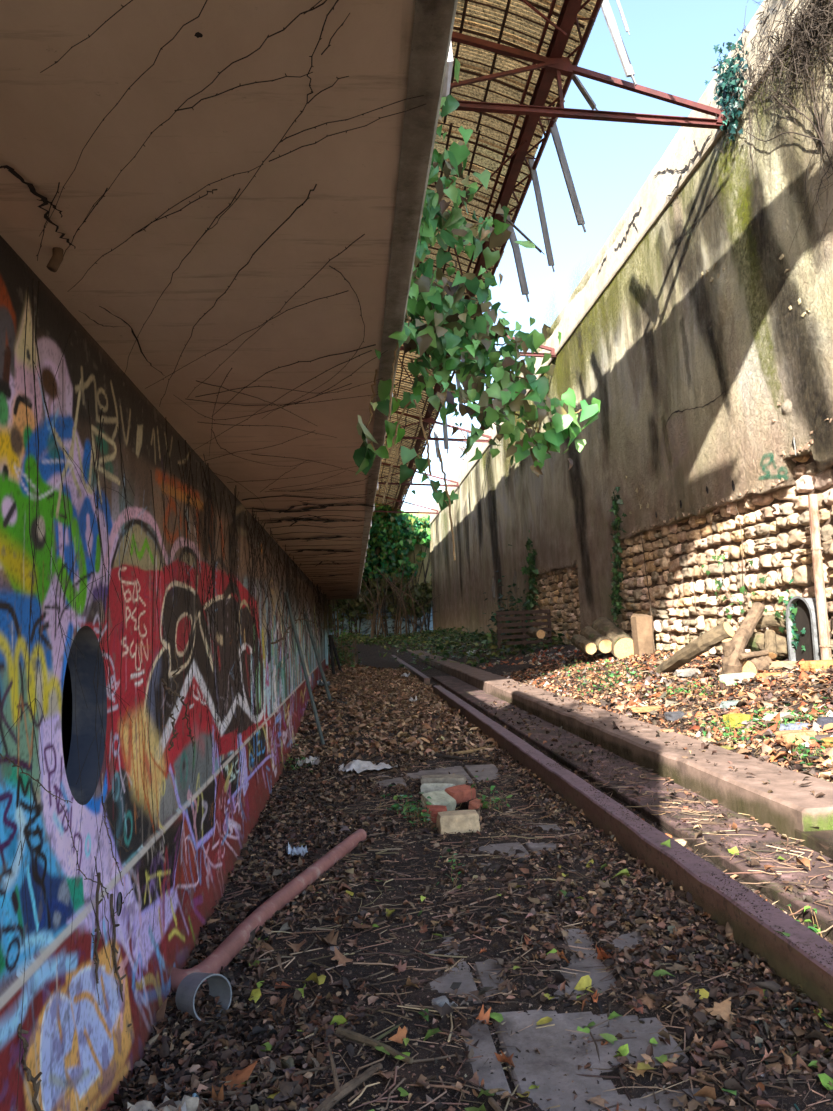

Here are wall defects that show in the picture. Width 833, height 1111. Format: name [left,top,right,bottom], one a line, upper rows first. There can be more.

crack [0,165,76,249]
damp [774,122,812,231]
damp [658,166,732,405]
damp [744,171,833,467]
damp [536,279,656,601]
spalling [780,431,814,459]
damp [430,450,517,606]